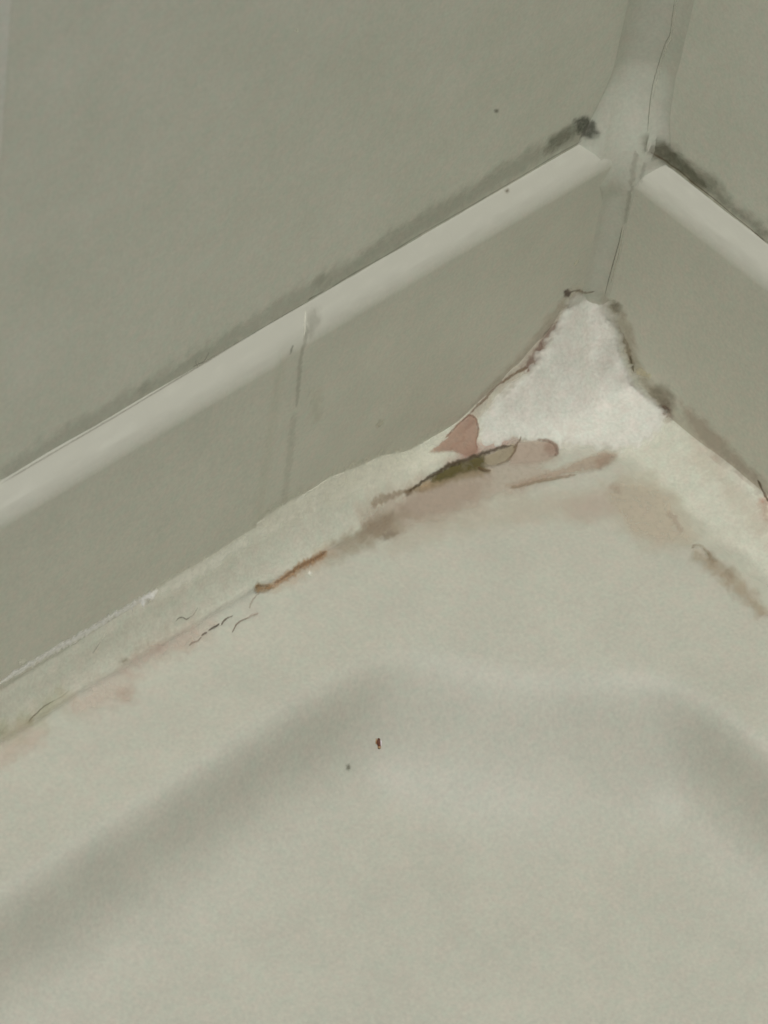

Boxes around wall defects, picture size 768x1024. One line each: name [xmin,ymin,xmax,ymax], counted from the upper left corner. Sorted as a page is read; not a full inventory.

water stain [577,118,595,137]
peeling [433,415,479,456]
rust [256,553,324,592]